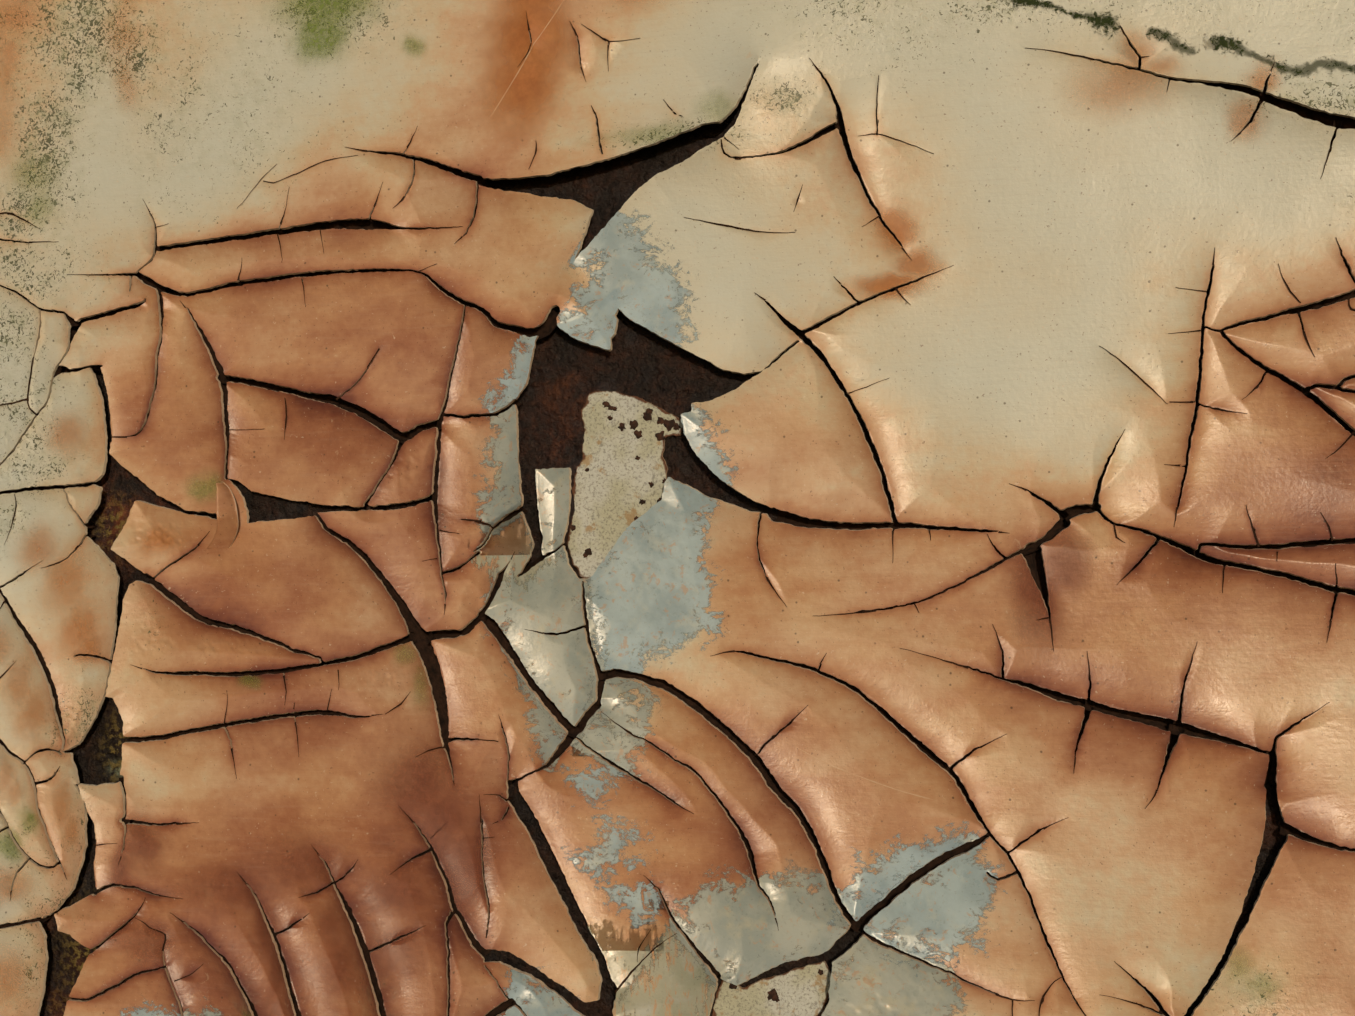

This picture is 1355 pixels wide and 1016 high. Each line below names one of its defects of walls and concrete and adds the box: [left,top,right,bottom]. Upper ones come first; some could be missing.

crack [569,21,639,154]
damp [1011,0,1120,37]
crack [1030,26,1355,179]
damp [1146,28,1355,79]
crack [721,58,1355,651]
peeling [0,64,1008,1016]
crack [0,126,1170,1016]
crack [900,624,1330,807]
crack [1279,822,1355,851]